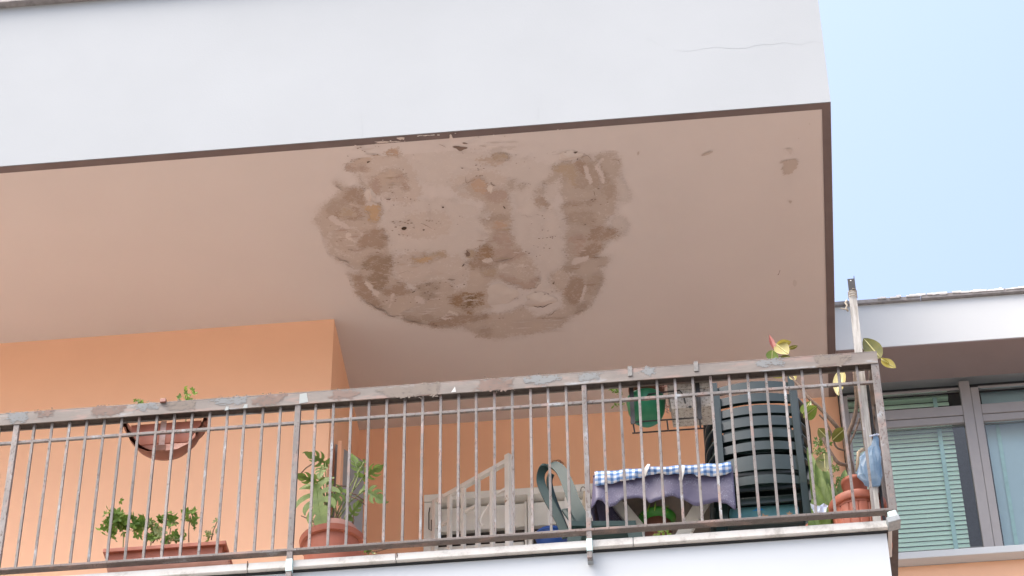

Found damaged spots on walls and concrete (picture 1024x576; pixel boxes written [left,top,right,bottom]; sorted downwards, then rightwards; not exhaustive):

flaking render [314,181,488,315]